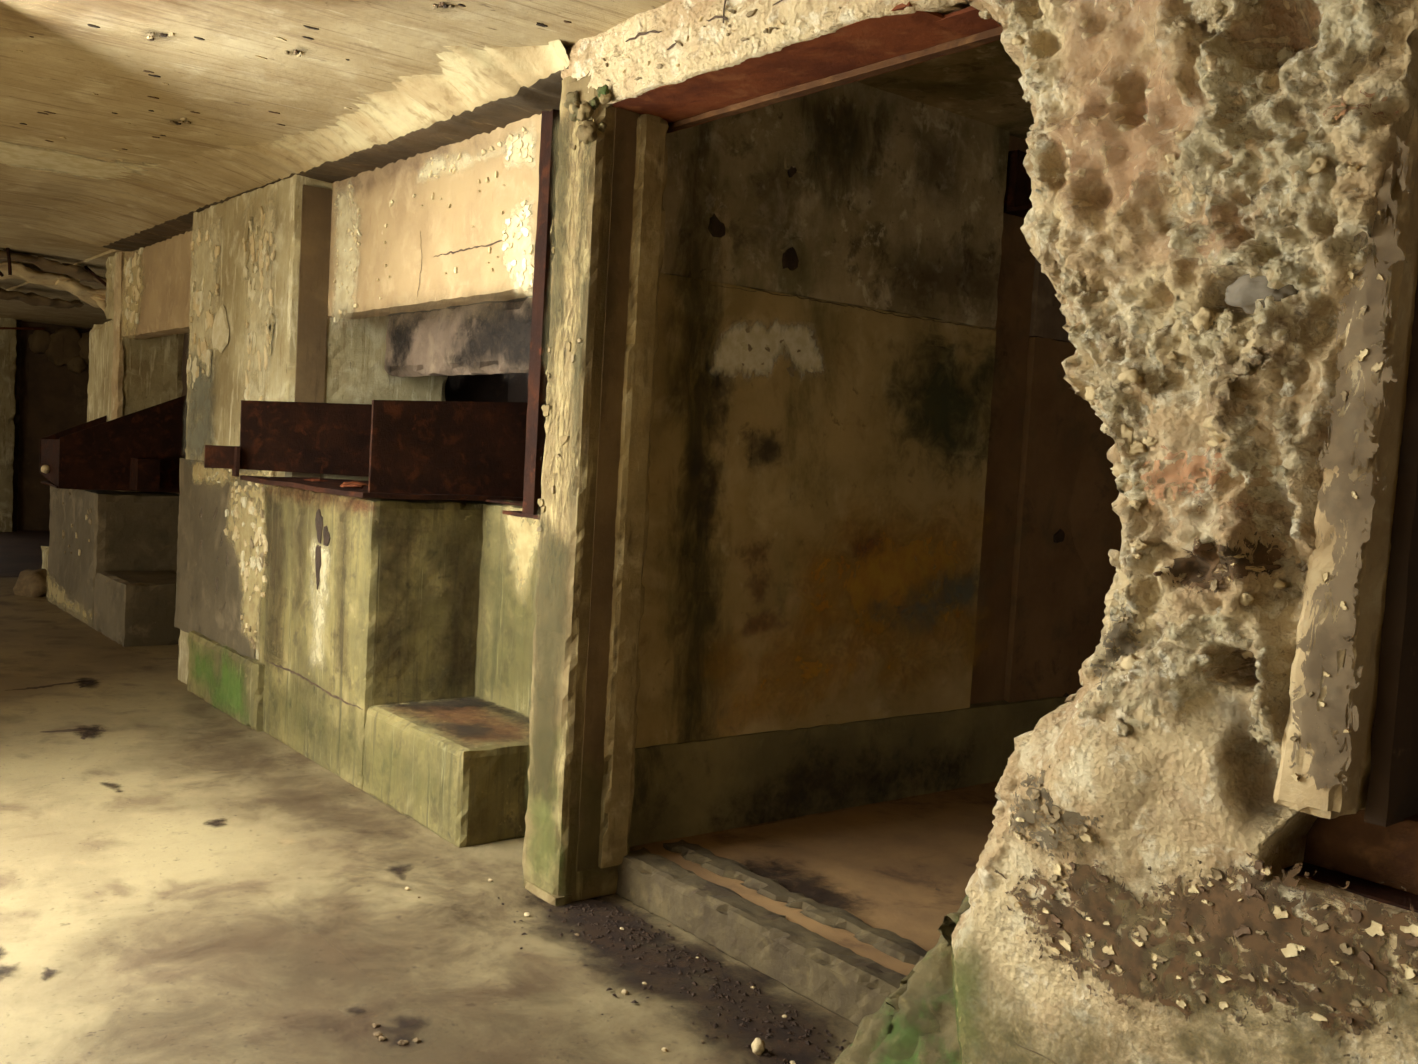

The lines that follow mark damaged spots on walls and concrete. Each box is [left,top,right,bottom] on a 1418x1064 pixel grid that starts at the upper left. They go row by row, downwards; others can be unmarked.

crack [625,30,676,50]
crack [707,0,729,23]
peeling [726,9,785,41]
peeling [186,219,229,389]
peeling [242,206,276,401]
leakage [387,316,420,378]
leakage [450,302,532,375]
leakage [890,340,1005,471]
spalling [979,0,1411,791]
peeling [193,462,275,649]
peeling [995,759,1418,1063]